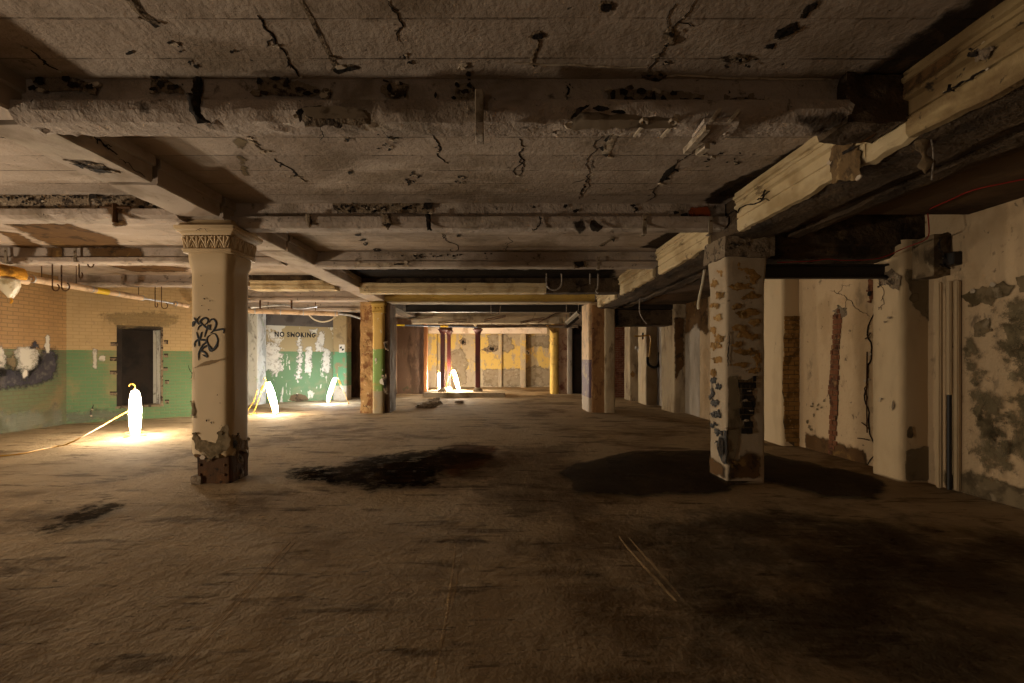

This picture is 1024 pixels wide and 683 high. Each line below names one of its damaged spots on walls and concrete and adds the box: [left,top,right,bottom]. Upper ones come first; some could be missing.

crack [257,15,303,78]
crack [388,0,404,41]
spalling [63,159,121,174]
crack [513,139,525,177]
crack [572,136,603,197]
water stain [30,335,50,353]
peeling [266,328,331,379]
flaking render [708,262,762,464]
flaking render [782,305,847,455]
crack [834,282,884,465]
flaking render [961,275,1024,481]
spalling [190,401,250,459]